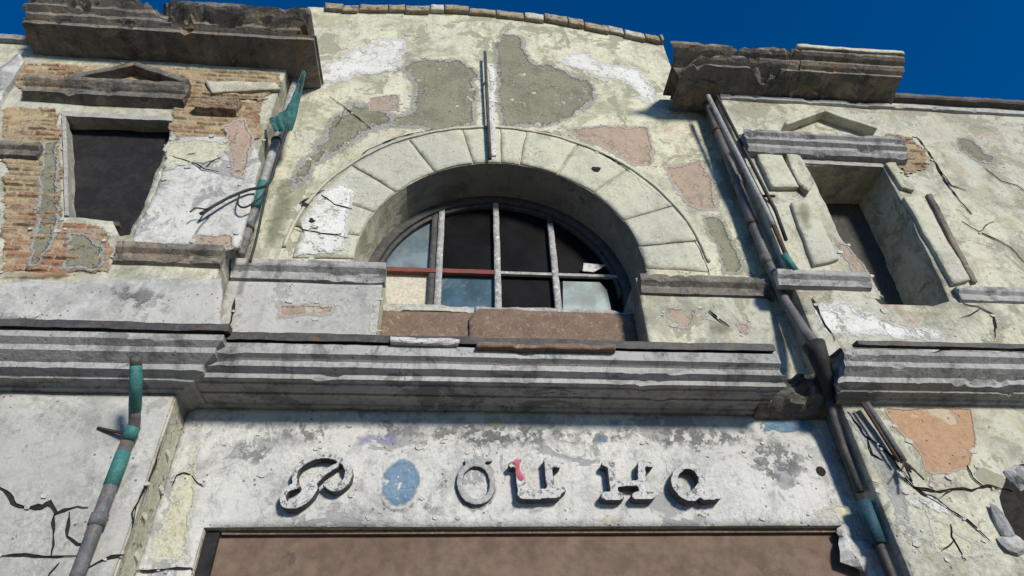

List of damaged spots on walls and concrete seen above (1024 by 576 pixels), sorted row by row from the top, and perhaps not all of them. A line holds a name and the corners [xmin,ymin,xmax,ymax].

spalling [0,106,115,274]
spalling [14,62,125,89]
spalling [122,66,282,186]
peeling [281,34,482,260]
peeling [492,28,744,275]
spalling [886,133,930,177]
crack [916,137,1024,262]
peeling [815,242,957,340]
crack [0,487,197,576]
crack [847,411,1013,561]
spalling [845,405,1024,562]